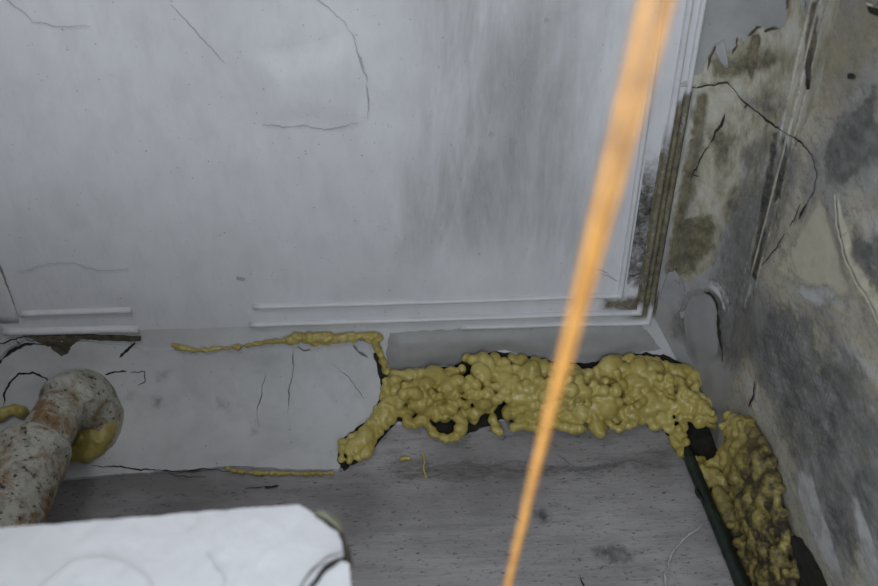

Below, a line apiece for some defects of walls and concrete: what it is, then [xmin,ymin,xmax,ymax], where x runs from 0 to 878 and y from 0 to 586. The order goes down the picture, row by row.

water stain [713,34,776,78]
water stain [605,93,714,317]
peeling [659,0,840,320]
crack [681,74,878,325]
water stain [824,90,878,184]
crack [0,262,128,405]
flaking render [22,334,141,356]
crack [704,281,730,361]
water stain [714,133,878,581]
flaking render [465,401,513,435]
flaking render [665,415,726,460]
crack [301,552,349,586]